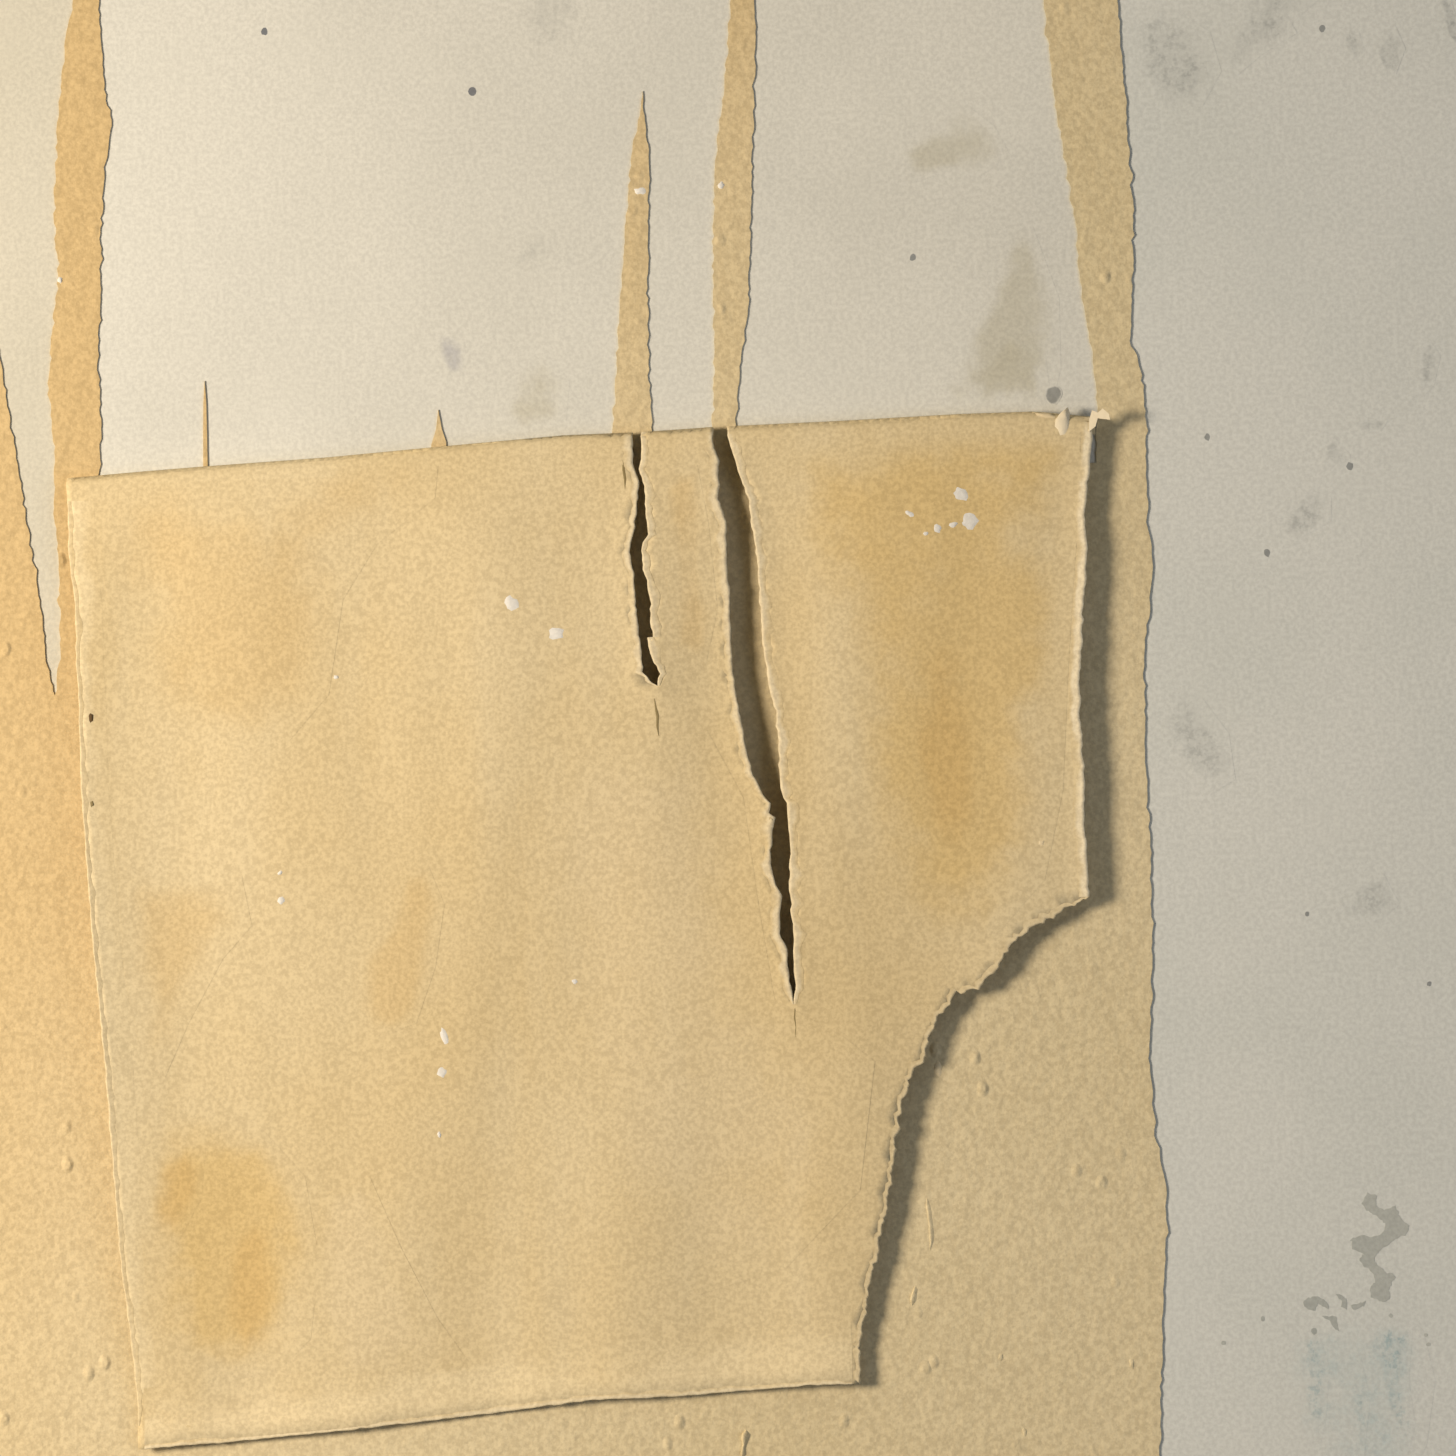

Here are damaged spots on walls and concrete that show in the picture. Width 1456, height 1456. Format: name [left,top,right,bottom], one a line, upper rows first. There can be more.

peeling [0,0,1110,1450]